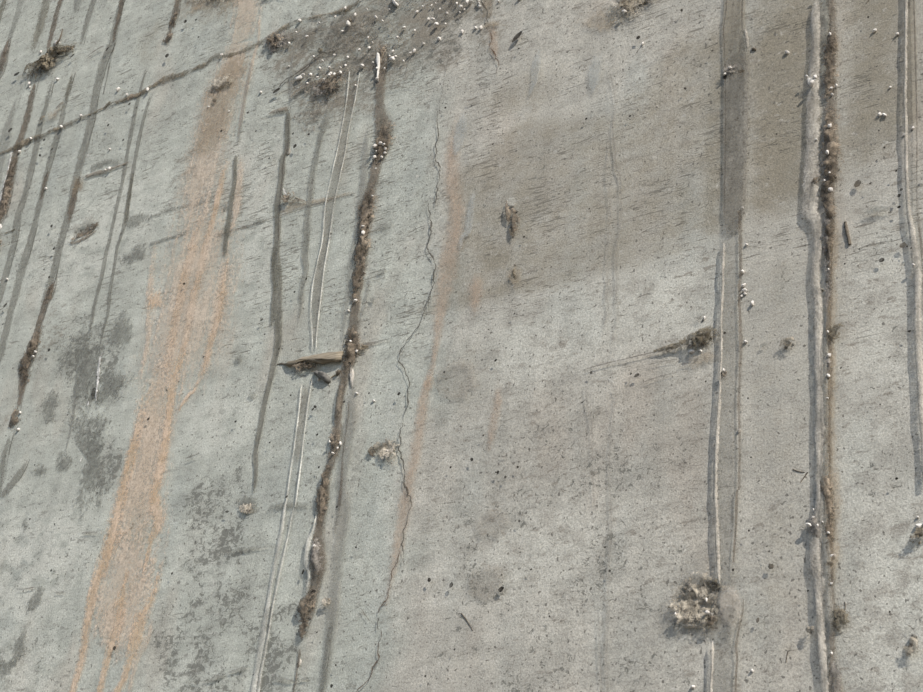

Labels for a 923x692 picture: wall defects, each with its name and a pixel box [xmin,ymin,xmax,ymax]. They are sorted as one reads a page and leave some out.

rust [233,164,243,226]
damp [332,71,360,178]
rust [70,227,235,692]
damp [250,382,312,692]
crack [356,100,441,692]